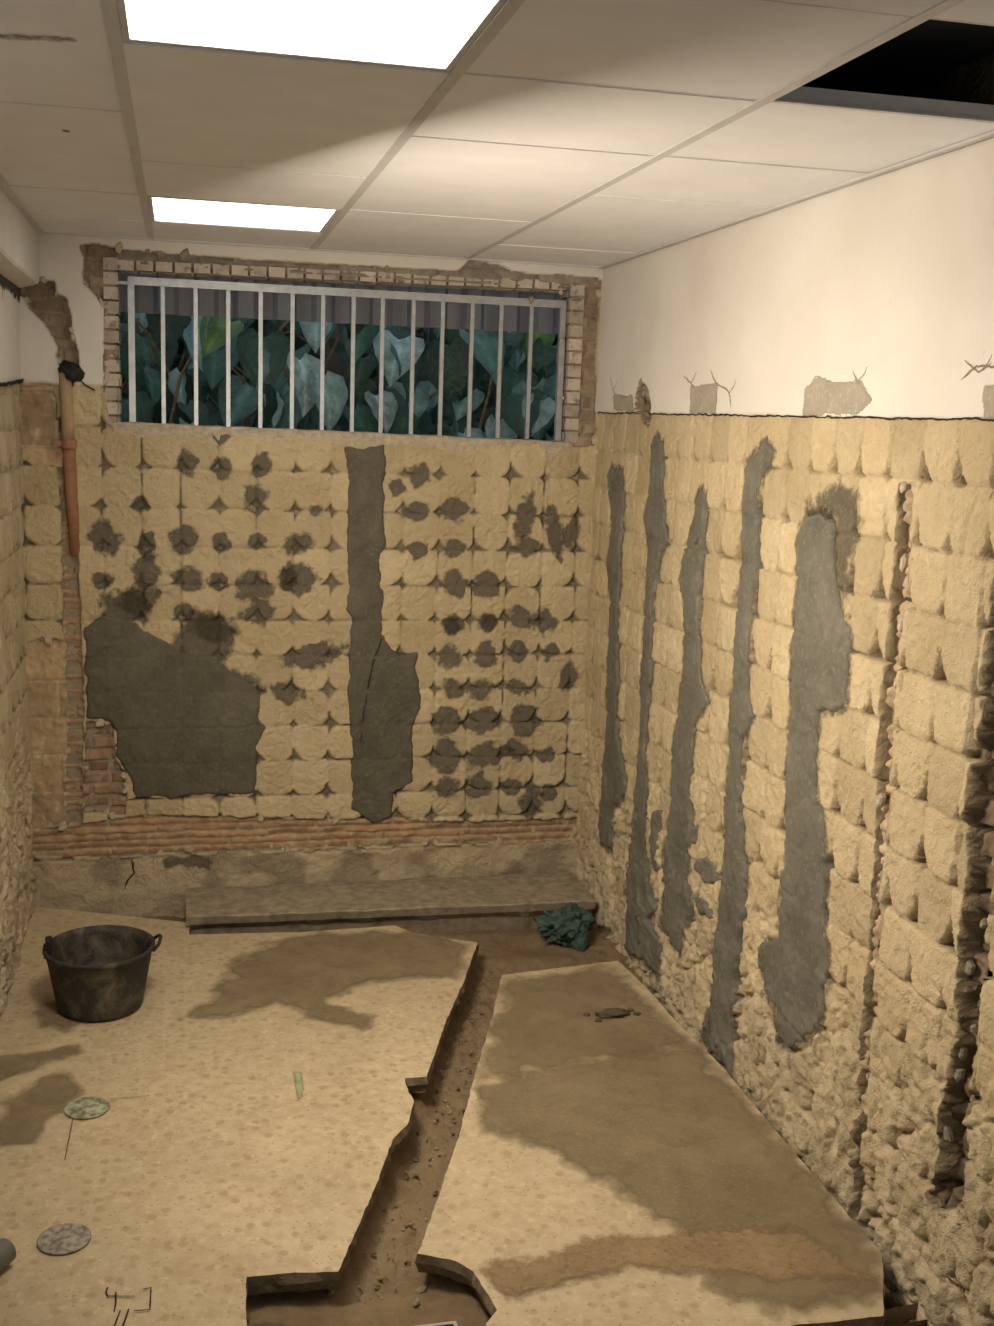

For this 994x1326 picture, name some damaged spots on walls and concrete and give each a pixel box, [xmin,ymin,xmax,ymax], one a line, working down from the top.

flaking render [21,276,79,364]
flaking render [81,242,602,447]
flaking render [19,385,63,467]
peeling [613,377,652,424]
peeling [802,376,872,416]
peeling [982,385,994,419]
flaking render [31,719,577,859]
leakage [477,432,881,1310]
leakage [37,1005,81,1028]
leakage [189,931,465,1028]
leakage [0,1045,83,1144]